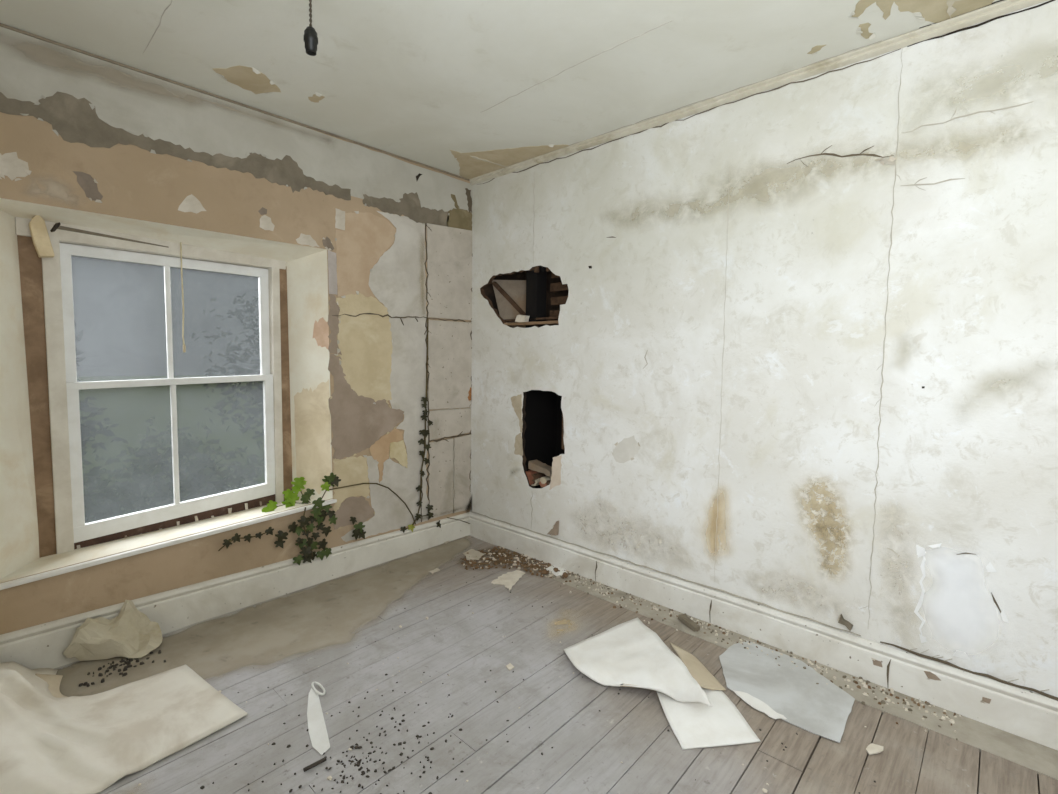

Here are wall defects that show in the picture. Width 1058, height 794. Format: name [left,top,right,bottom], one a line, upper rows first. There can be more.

peeling [848,0,994,40]
peeling [212,65,281,94]
peeling [450,144,569,179]
leakage [716,161,838,204]
peeling [0,91,472,529]